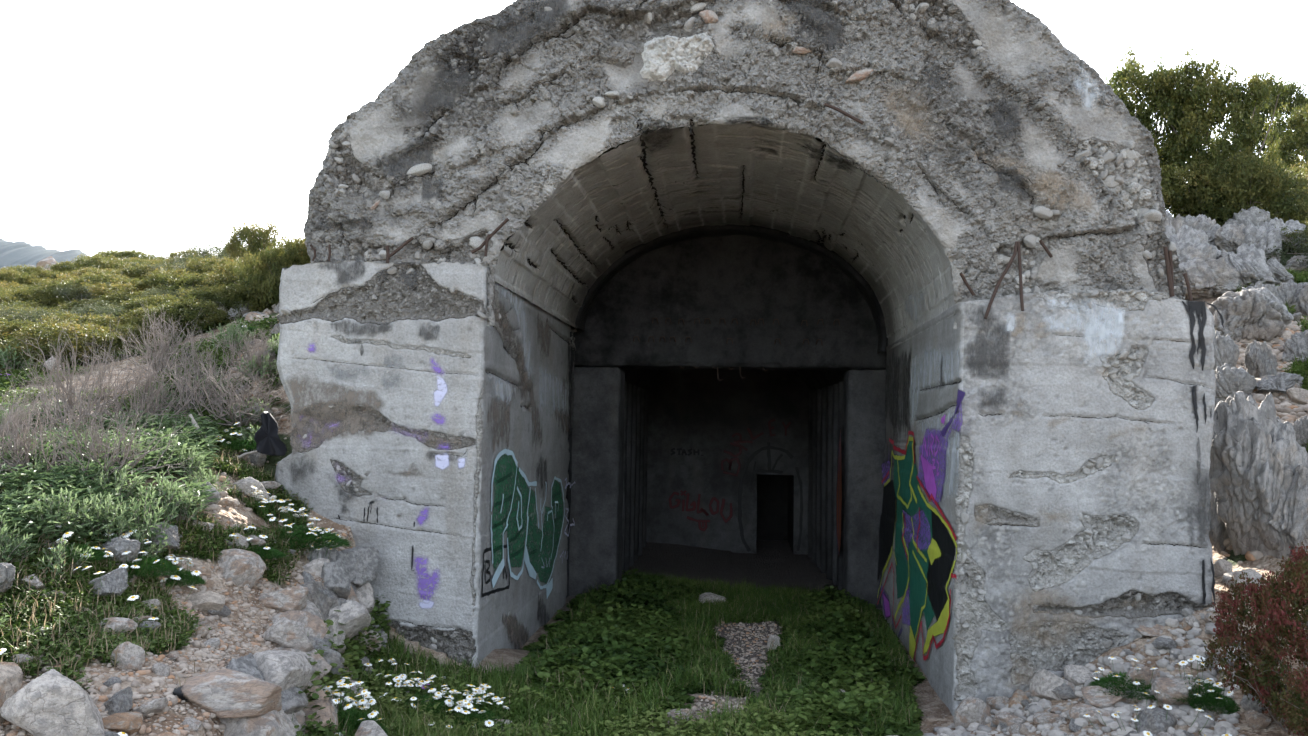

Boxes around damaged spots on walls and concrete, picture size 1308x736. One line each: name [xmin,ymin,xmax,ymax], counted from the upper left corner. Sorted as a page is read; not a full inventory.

crack [503,0,682,64]
spalling [323,135,396,198]
crack [395,111,448,185]
crack [425,118,580,229]
crack [504,87,802,304]
spalling [277,218,530,391]
crack [299,296,568,409]
spalling [984,232,1193,319]
damp [1182,301,1224,371]
spalling [290,387,485,614]
spalling [952,434,1216,701]
spalling [387,620,476,666]